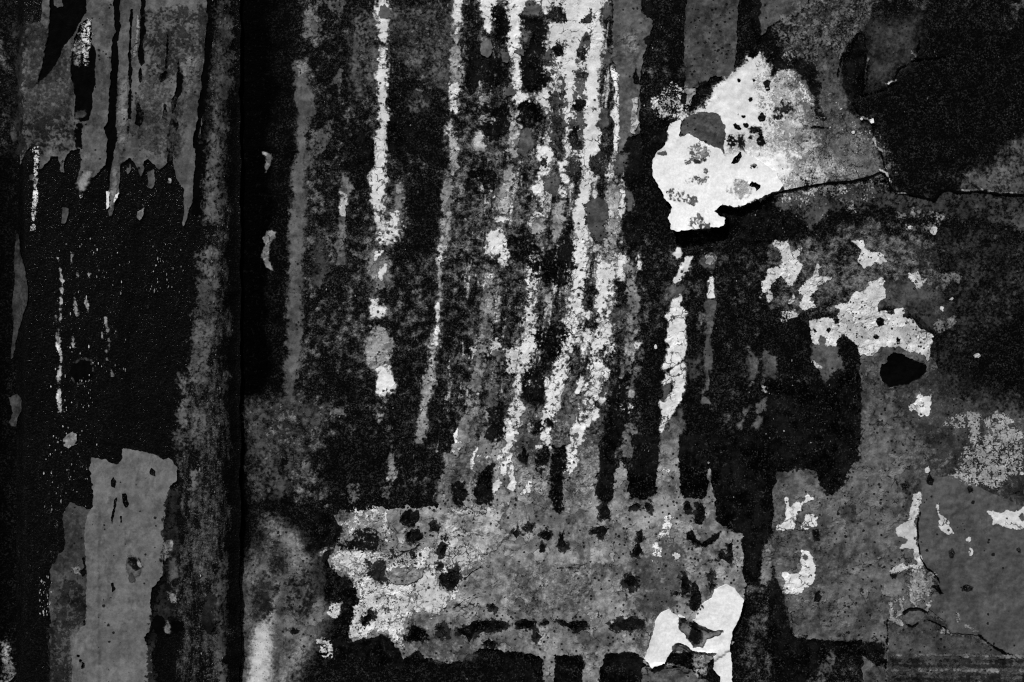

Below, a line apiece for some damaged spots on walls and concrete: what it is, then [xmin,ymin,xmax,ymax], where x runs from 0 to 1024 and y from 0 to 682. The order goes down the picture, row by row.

damp [12,0,96,231]
damp [55,252,91,413]
damp [104,0,238,228]
damp [354,89,416,174]
damp [412,118,501,444]
damp [449,0,559,147]
damp [451,198,619,514]
damp [602,80,713,281]
peeling [480,0,1024,682]
crack [772,31,1024,201]
peeling [46,448,184,682]
peeling [322,366,747,682]